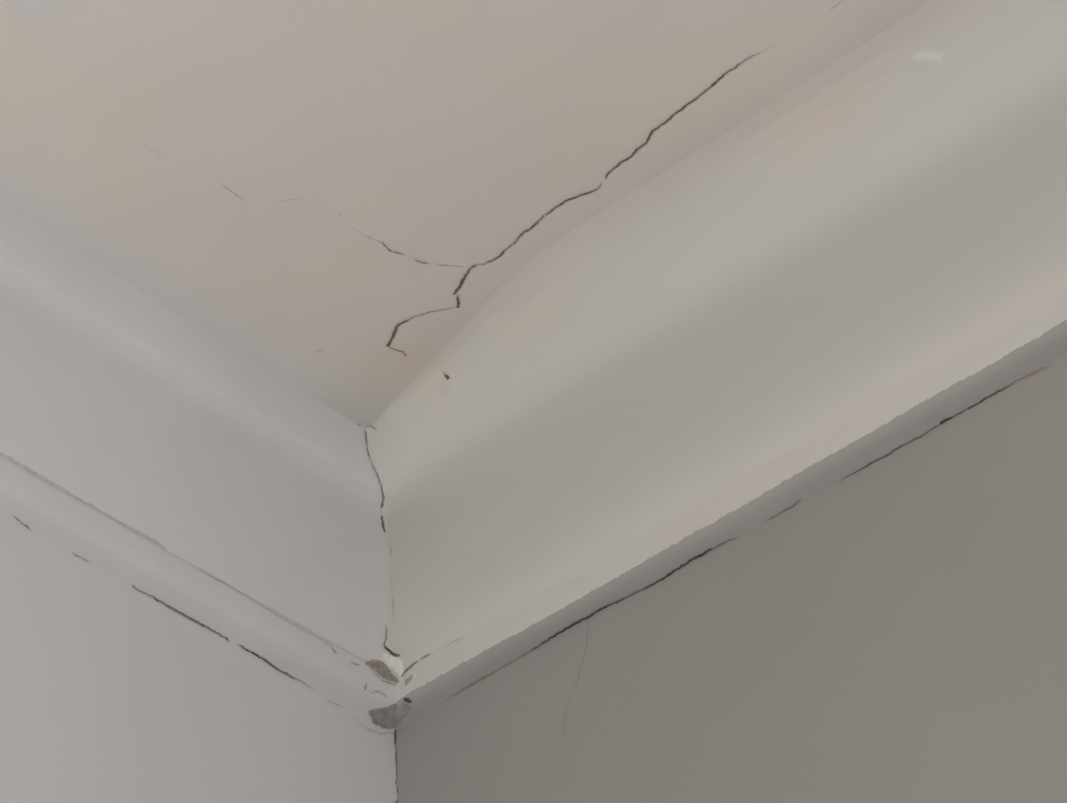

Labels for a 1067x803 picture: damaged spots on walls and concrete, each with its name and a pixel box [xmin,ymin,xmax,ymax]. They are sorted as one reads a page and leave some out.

crack [382,56,752,356]
crack [860,373,1033,470]
crack [365,431,385,532]
crack [132,585,294,678]
spalling [363,652,415,729]
crack [384,626,428,677]
crack [532,539,734,650]